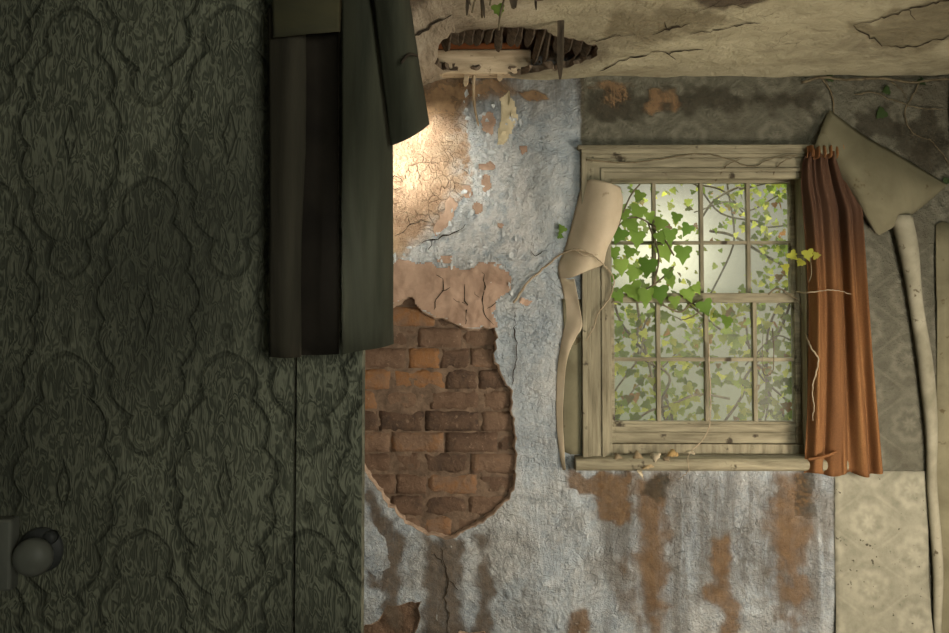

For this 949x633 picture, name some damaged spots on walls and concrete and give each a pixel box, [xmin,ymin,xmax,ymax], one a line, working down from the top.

crack [415,15,451,36]
water stain [698,0,766,9]
spalling [365,89,548,539]
peeling [893,215,949,633]
corrosion [569,471,669,633]
corrosion [704,536,740,633]